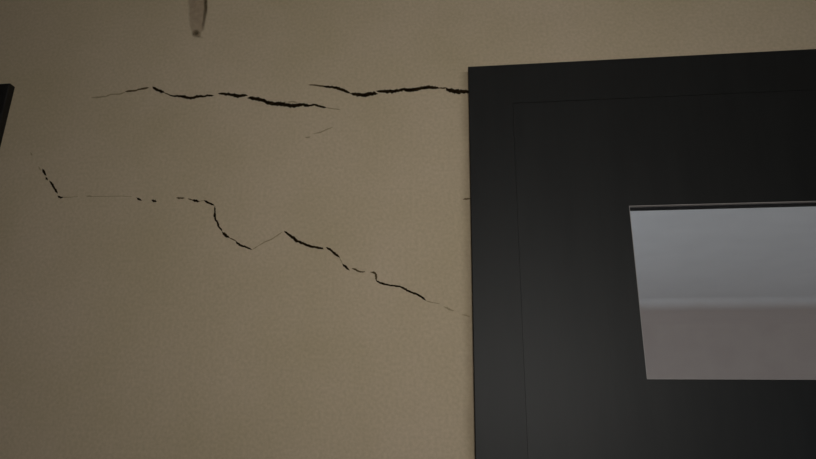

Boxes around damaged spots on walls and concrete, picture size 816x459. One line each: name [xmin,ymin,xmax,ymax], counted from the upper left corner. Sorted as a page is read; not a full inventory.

crack [91,84,469,138]
crack [30,152,470,317]